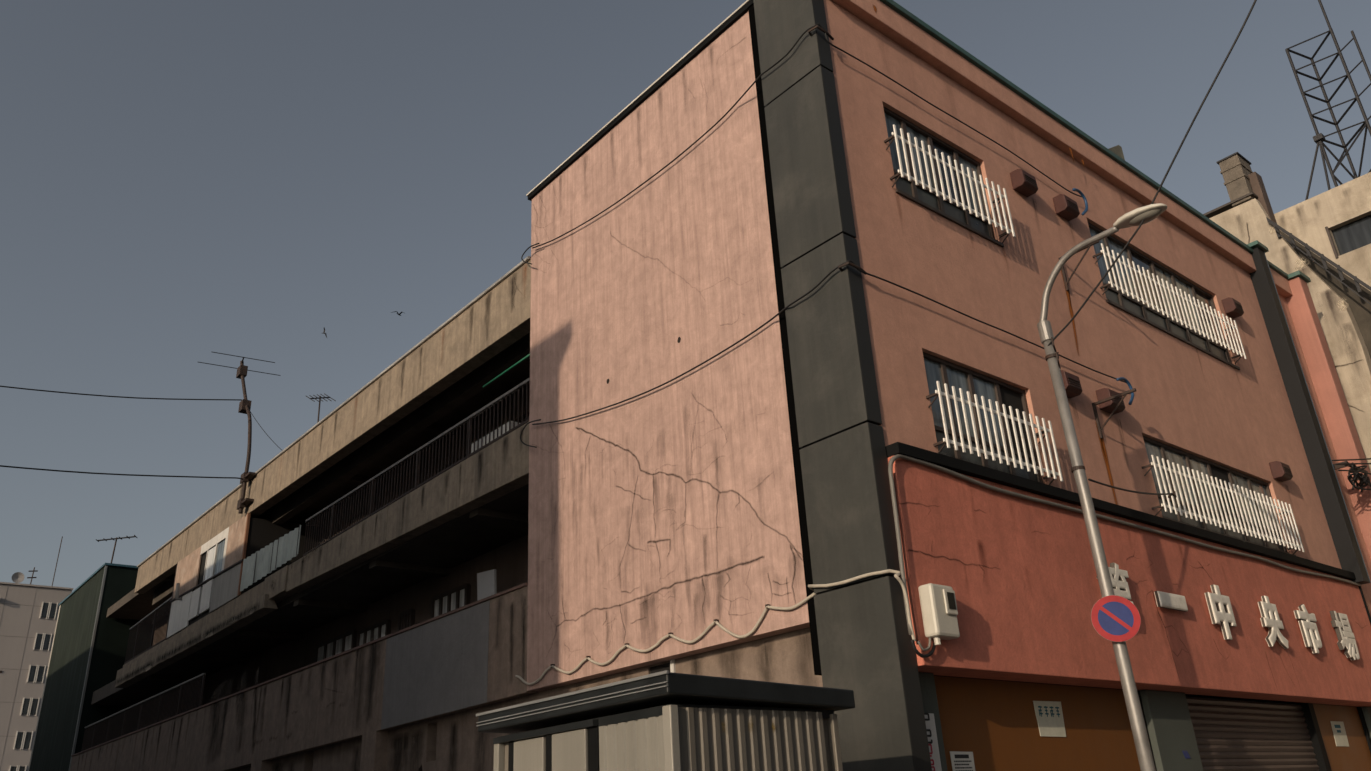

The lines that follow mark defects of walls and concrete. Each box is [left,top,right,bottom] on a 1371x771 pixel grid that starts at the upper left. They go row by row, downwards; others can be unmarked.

rust [1061,270,1078,351]
rust [1096,423,1118,505]
crack [564,428,797,623]